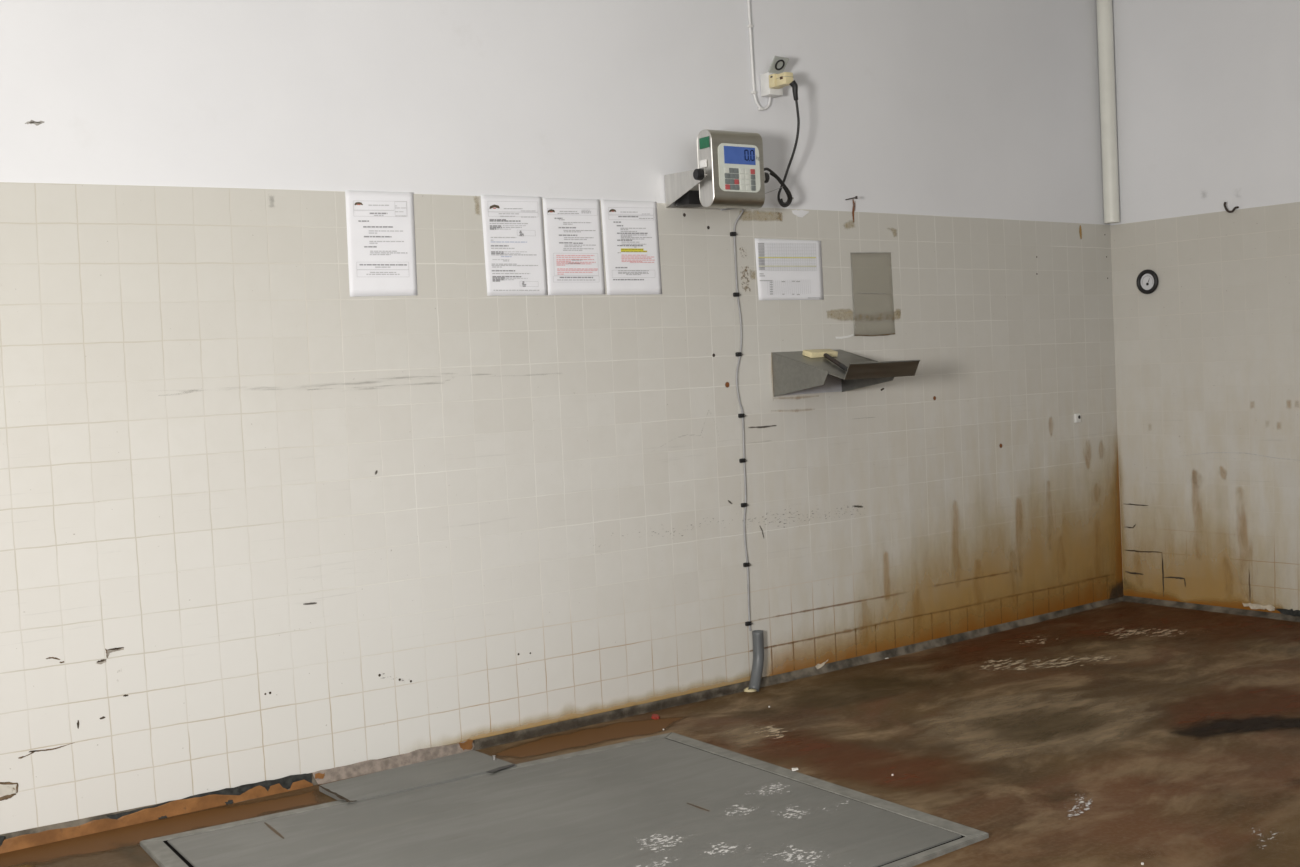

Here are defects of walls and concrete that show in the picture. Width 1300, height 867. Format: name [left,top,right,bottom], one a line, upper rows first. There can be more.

water stain [865,490,1254,642]
peeling [0,773,325,867]